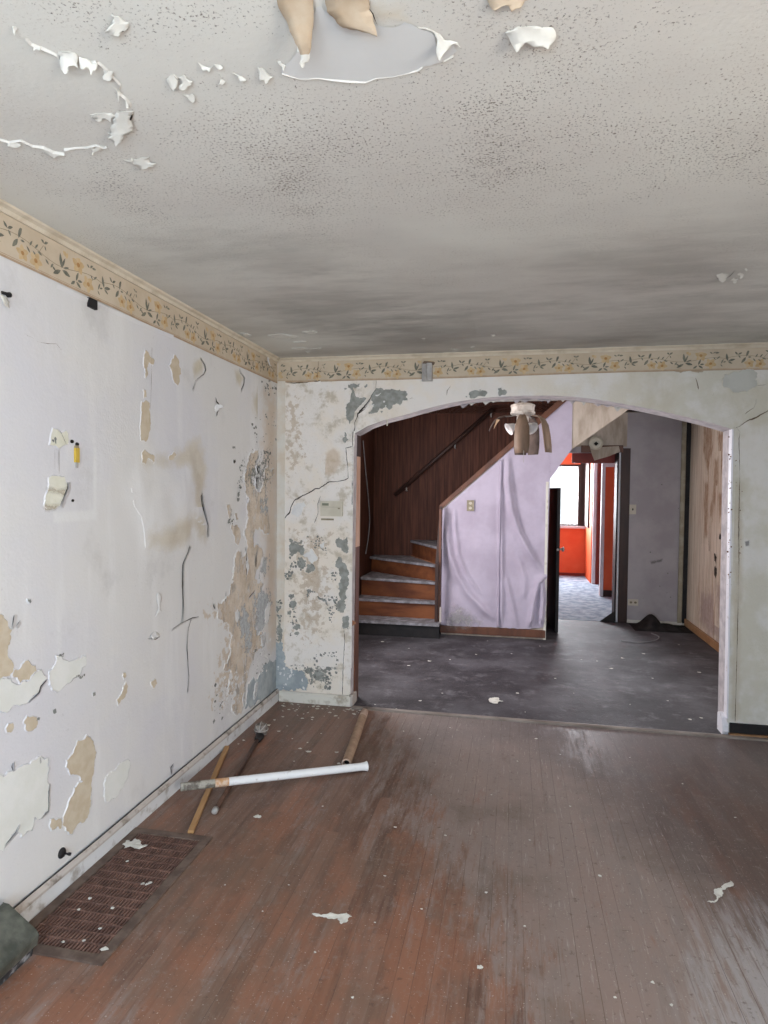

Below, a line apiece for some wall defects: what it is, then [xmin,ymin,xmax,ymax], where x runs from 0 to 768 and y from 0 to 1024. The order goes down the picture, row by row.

peeling [0,26,134,159]
peeling [103,14,129,37]
peeling [199,6,461,86]
peeling [505,26,556,53]
peeling [139,348,155,464]
crack [285,380,376,520]
peeling [342,383,408,443]
crack [172,495,210,692]
peeling [186,383,353,757]
peeling [0,613,36,684]
peeling [4,715,40,734]
peeling [49,734,97,835]